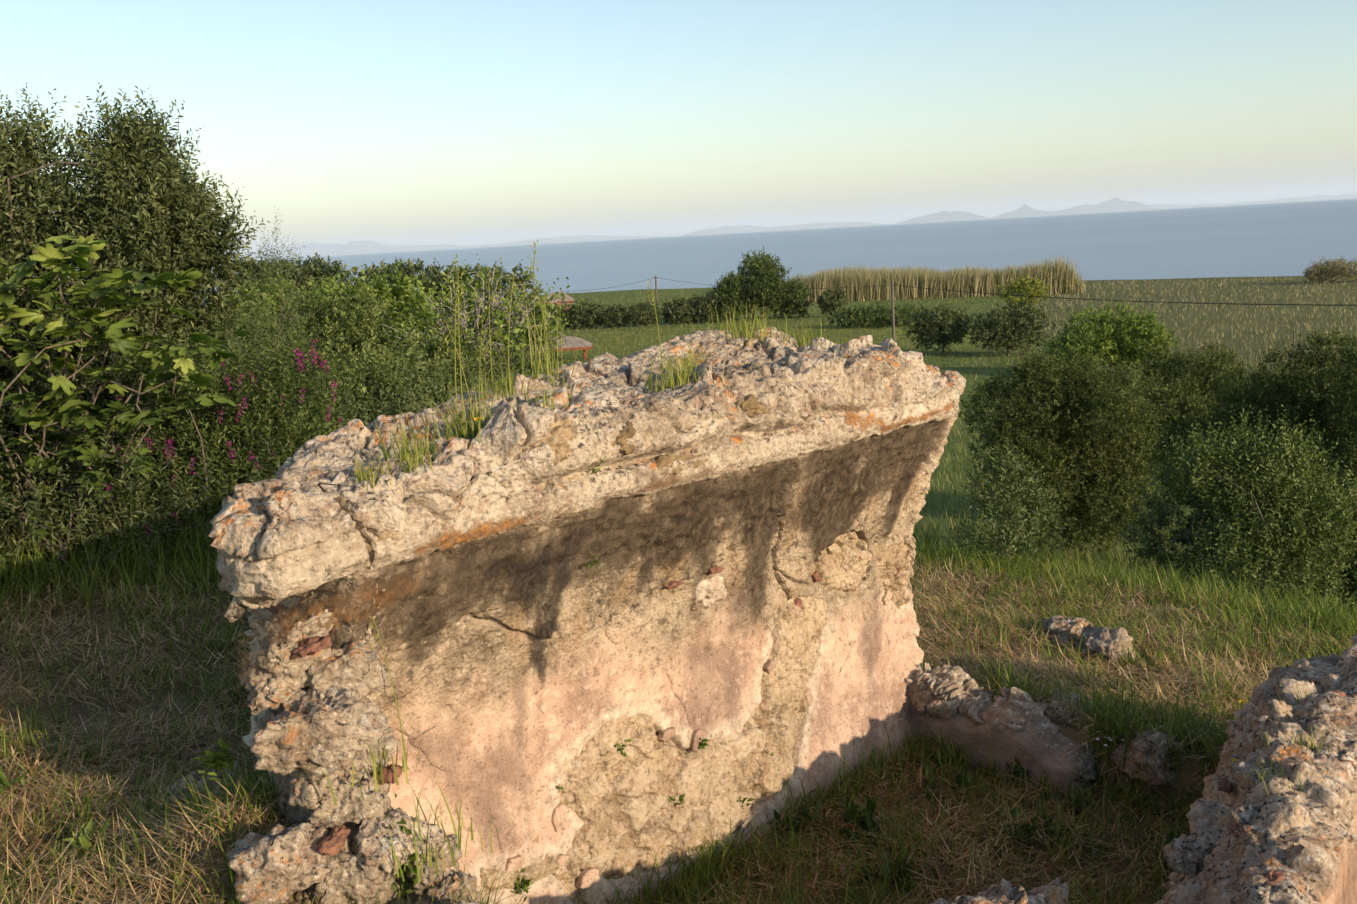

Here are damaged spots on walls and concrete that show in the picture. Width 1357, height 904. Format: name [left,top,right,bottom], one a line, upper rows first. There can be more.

crack [469,601,532,637]
water stain [243,419,946,685]
spalling [480,530,911,904]